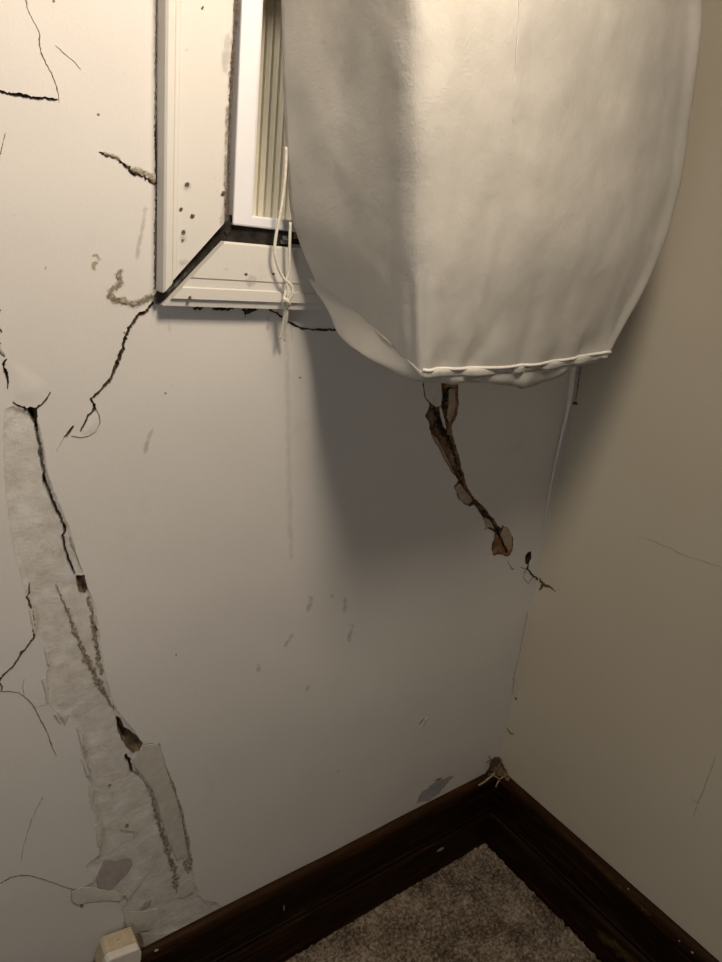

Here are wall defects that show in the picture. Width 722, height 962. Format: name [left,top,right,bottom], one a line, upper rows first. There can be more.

crack [0,0,157,573]
crack [0,638,57,756]
peeling [3,406,221,952]
spalling [478,756,510,787]
crack [0,797,74,890]